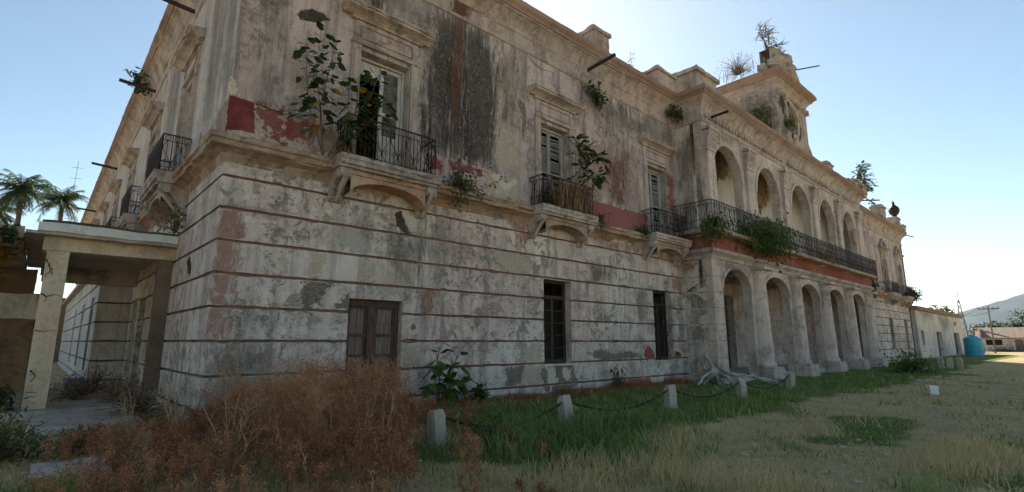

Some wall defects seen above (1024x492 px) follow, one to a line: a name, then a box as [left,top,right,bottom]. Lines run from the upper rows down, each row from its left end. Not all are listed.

peeling [225,62,320,153]
damp [372,0,520,165]
flaking render [395,211,426,236]
crack [41,259,59,302]
flaking render [294,247,349,310]
flaking render [503,342,578,394]
flaking render [587,344,655,360]